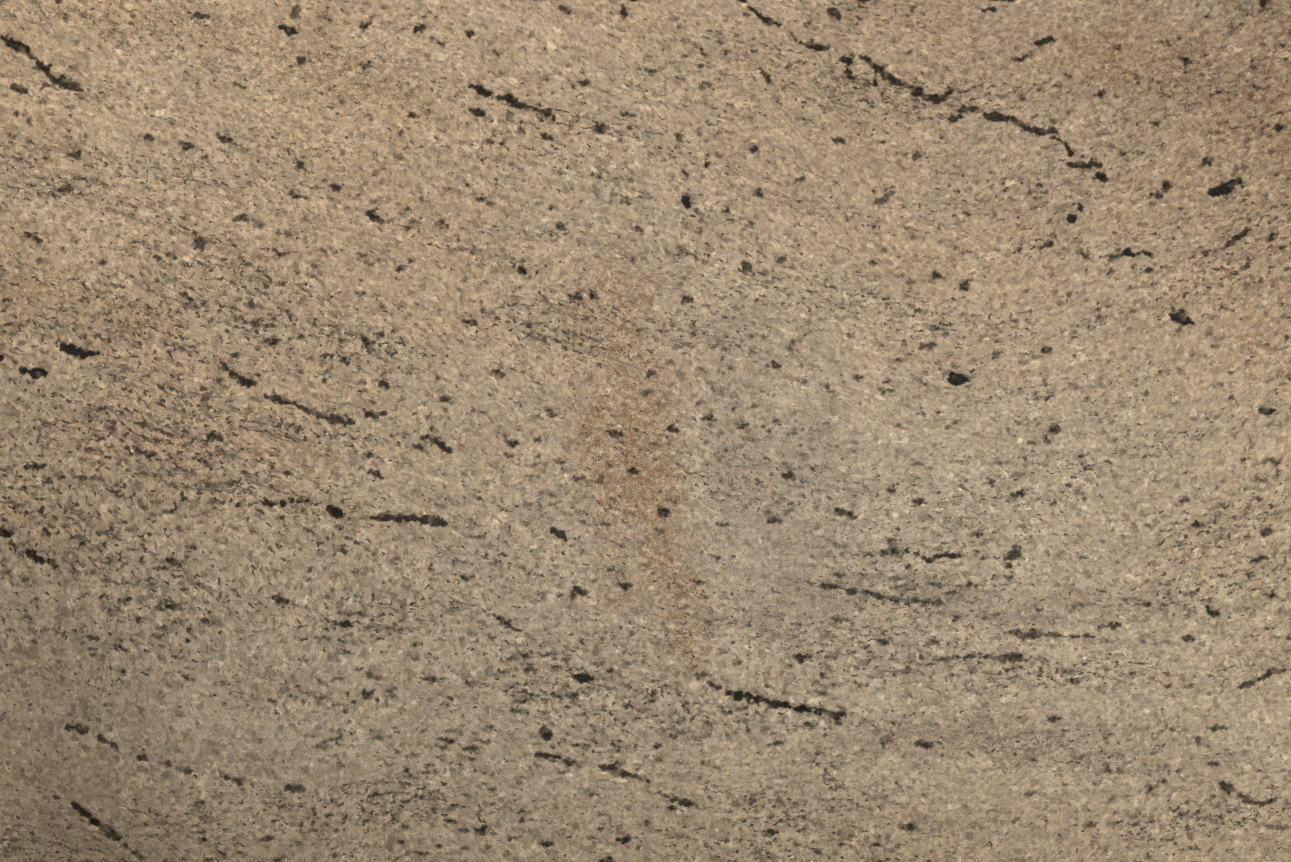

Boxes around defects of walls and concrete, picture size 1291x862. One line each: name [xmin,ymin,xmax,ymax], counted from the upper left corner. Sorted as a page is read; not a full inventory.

crack [740,0,1109,182]